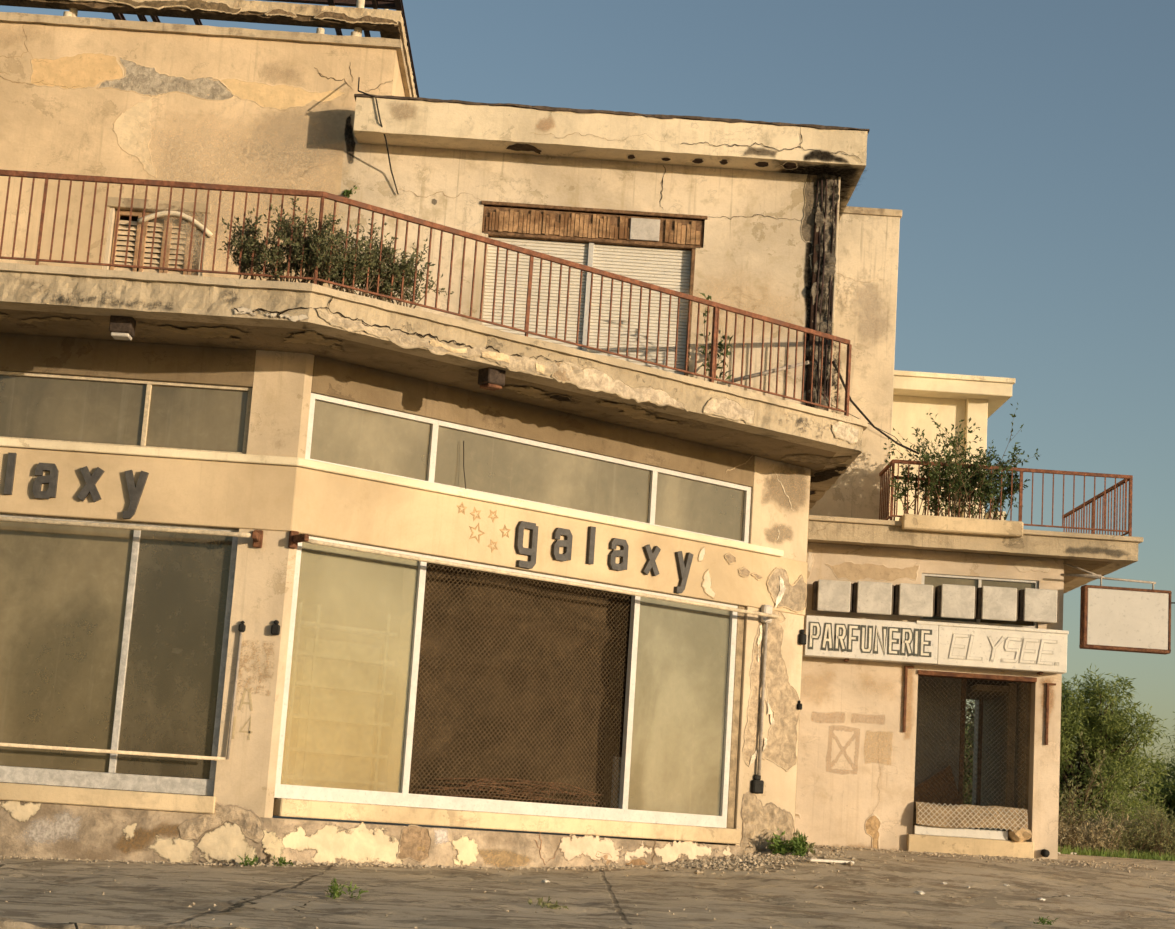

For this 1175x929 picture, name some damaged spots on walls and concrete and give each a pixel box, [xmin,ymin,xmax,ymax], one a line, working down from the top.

spalling [108,0,242,14]
spalling [265,8,297,18]
spalling [314,11,398,25]
peeling [30,52,346,178]
crack [532,126,861,208]
damp [803,242,813,391]
spalling [233,306,688,412]
peeling [703,397,755,425]
flaking render [724,548,920,772]
peeling [0,801,42,823]
peeling [148,802,432,865]
peeling [449,835,479,866]